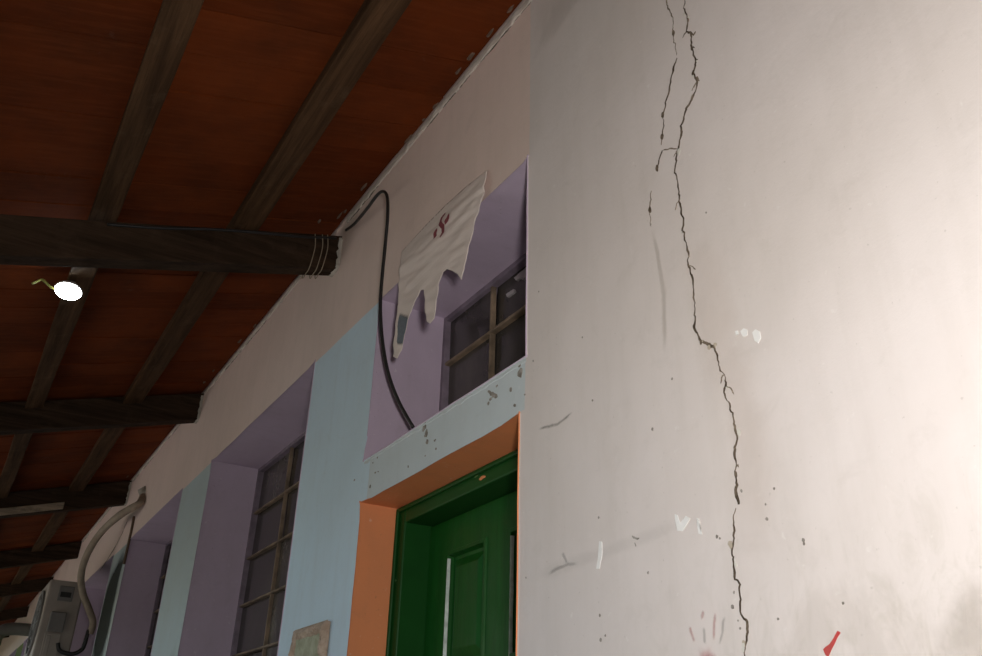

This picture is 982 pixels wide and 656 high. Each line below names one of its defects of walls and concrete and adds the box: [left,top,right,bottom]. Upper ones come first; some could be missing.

crack [648,0,749,656]